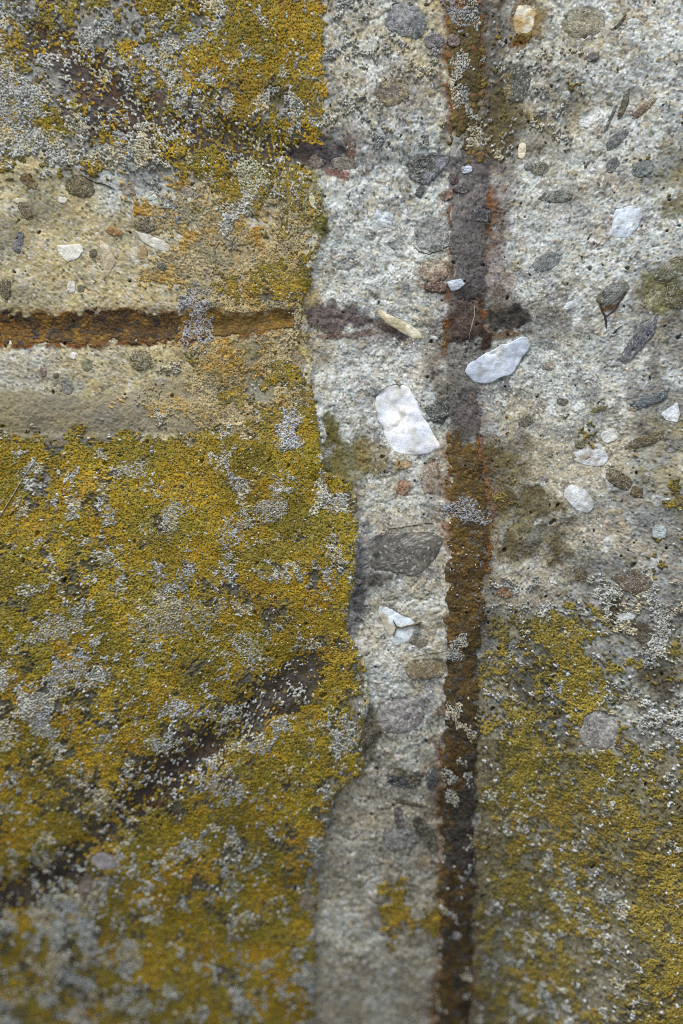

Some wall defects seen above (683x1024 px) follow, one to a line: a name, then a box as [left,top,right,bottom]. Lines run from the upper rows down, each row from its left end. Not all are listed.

corrosion [0,299,410,349]
corrosion [432,0,531,1024]